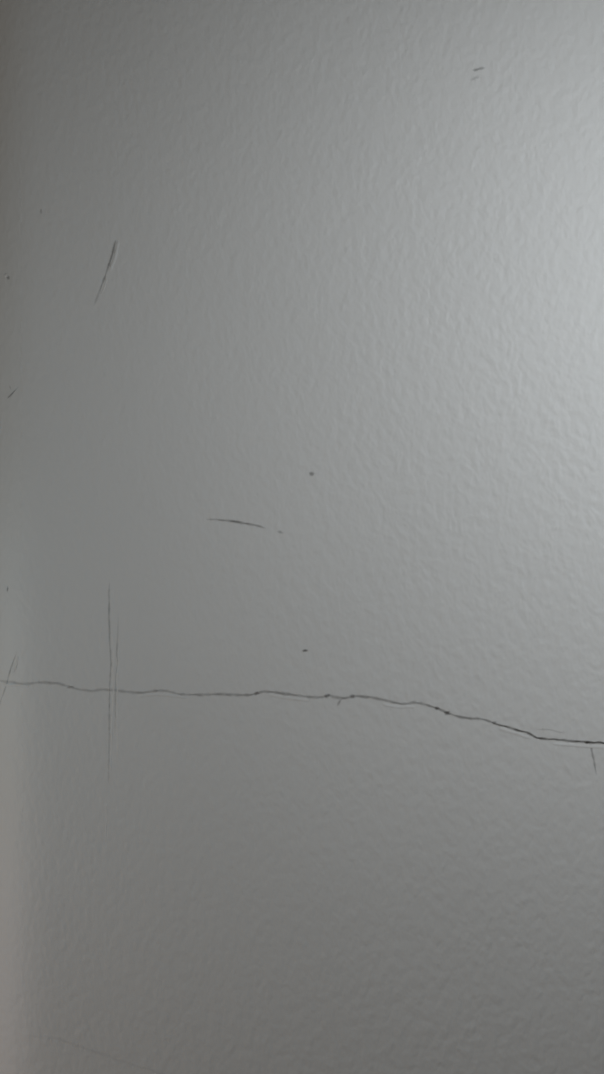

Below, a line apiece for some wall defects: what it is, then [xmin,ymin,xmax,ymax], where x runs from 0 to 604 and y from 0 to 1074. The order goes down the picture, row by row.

crack [498,724,604,749]